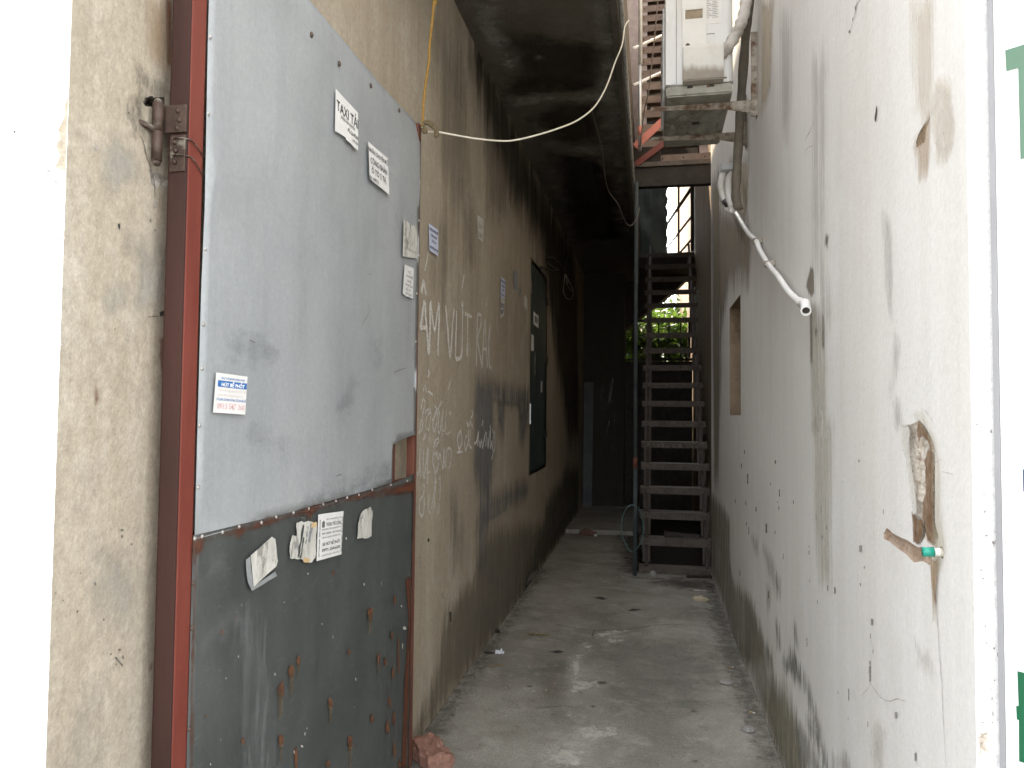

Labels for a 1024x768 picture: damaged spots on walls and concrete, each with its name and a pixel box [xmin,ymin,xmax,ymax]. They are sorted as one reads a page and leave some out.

corrosion [371,578,411,768]
water stain [420,376,578,728]
water stain [656,494,824,768]
flaking render [902,420,938,546]